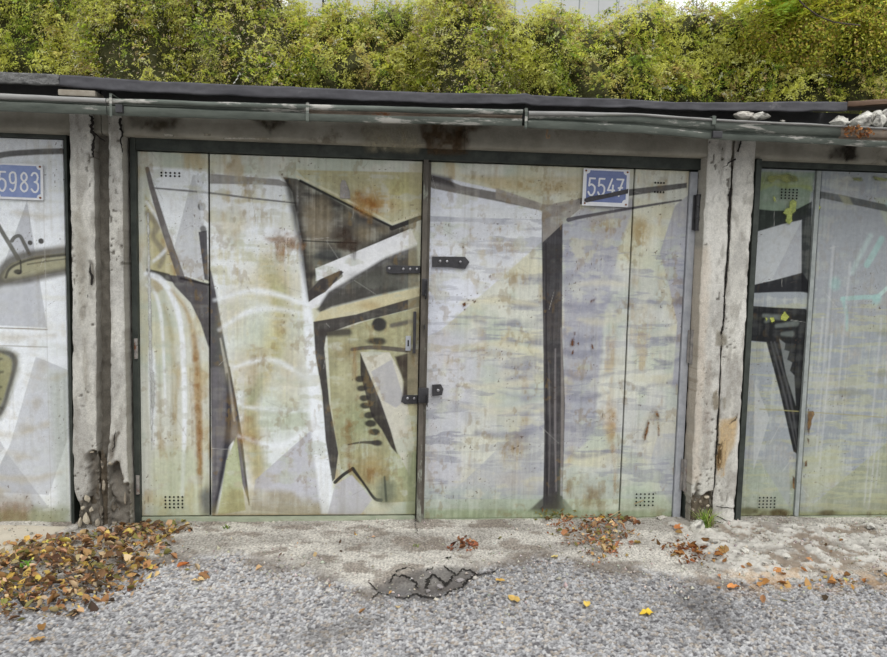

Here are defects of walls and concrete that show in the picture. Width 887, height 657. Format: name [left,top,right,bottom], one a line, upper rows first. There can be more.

spalling [78,450,126,527]
crack [711,141,742,523]